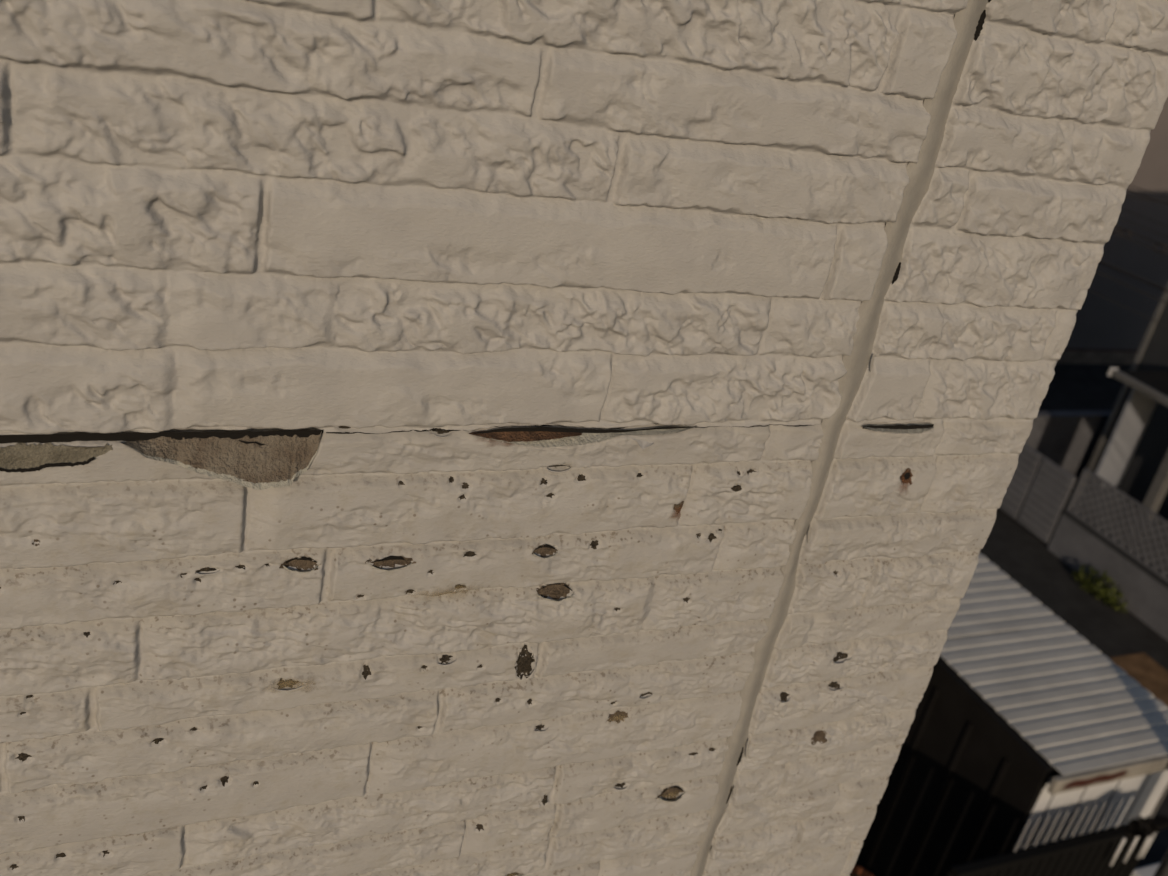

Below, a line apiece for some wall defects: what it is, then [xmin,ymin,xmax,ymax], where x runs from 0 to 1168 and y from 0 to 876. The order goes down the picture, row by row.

peeling [861,423,934,434]
peeling [468,426,697,449]
peeling [0,430,322,490]
spalling [532,544,558,559]
spalling [279,557,321,573]
spalling [365,556,416,571]
spalling [536,583,574,602]
spalling [514,645,537,679]
spalling [656,786,686,802]